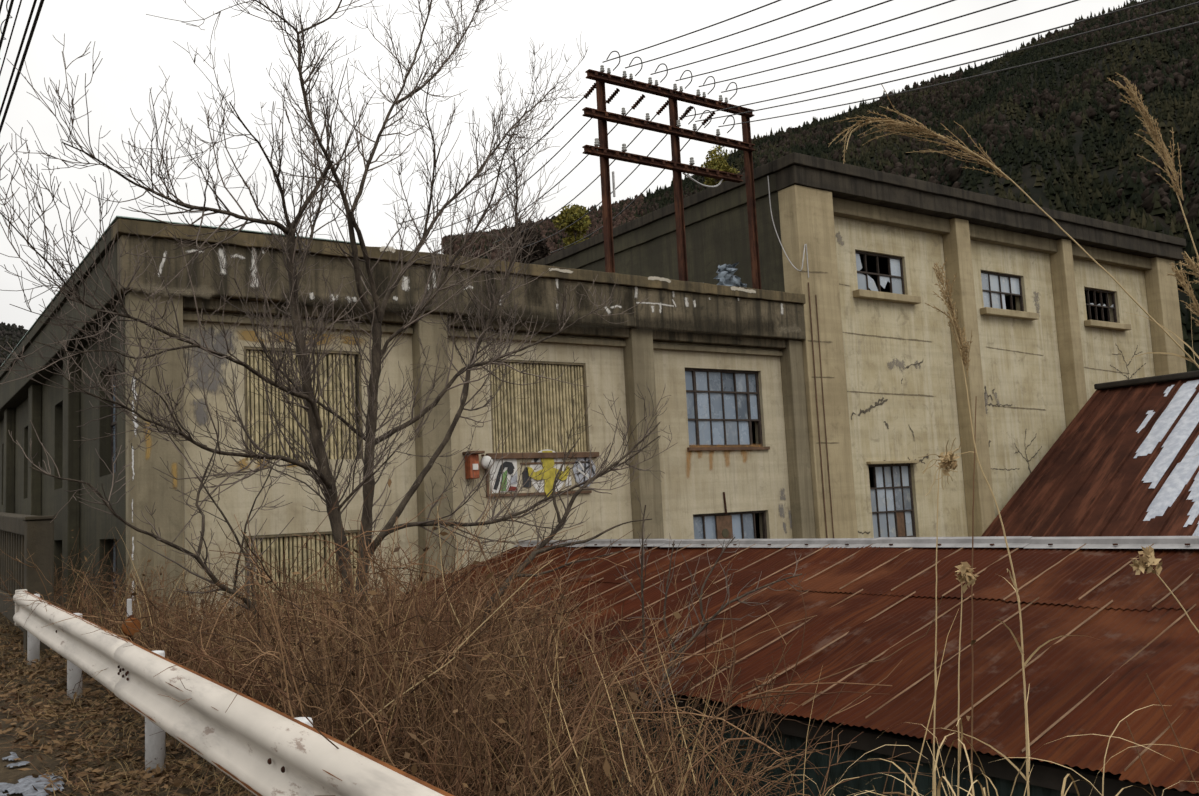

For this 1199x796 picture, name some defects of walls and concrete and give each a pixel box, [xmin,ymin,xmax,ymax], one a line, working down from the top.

crack [851,360,929,466]
crack [984,386,1012,407]
crack [989,431,1042,473]